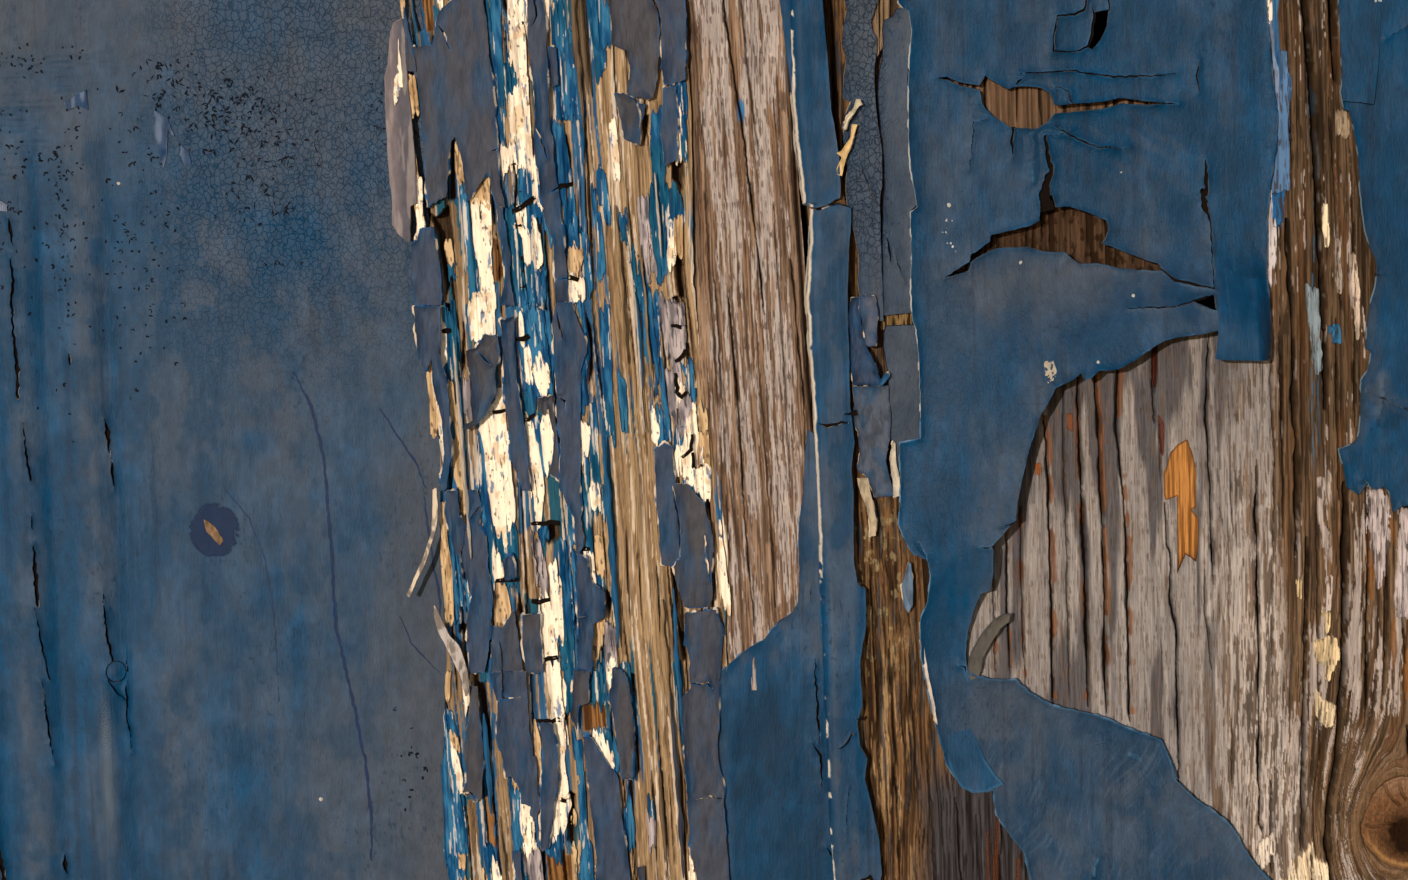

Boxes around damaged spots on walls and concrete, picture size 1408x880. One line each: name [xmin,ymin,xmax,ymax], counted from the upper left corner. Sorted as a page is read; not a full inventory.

peeling [368,0,731,880]
peeling [836,0,1302,880]
peeling [1317,476,1330,557]
peeling [1365,487,1408,620]
peeling [1313,574,1341,728]
crack [0,850,8,880]